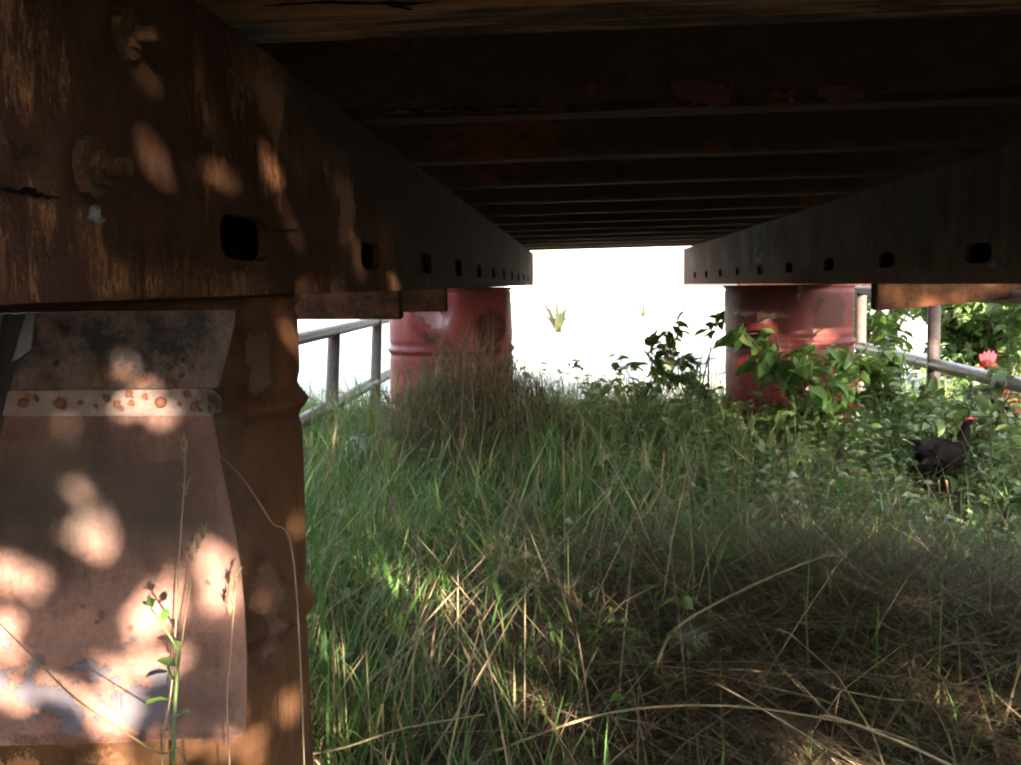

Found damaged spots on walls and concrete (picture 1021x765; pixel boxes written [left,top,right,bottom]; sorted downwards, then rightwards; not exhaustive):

rust [0,0,69,127]
crack [0,186,62,200]
rust [74,212,268,300]
rust [302,144,359,293]
peeling [0,645,191,741]